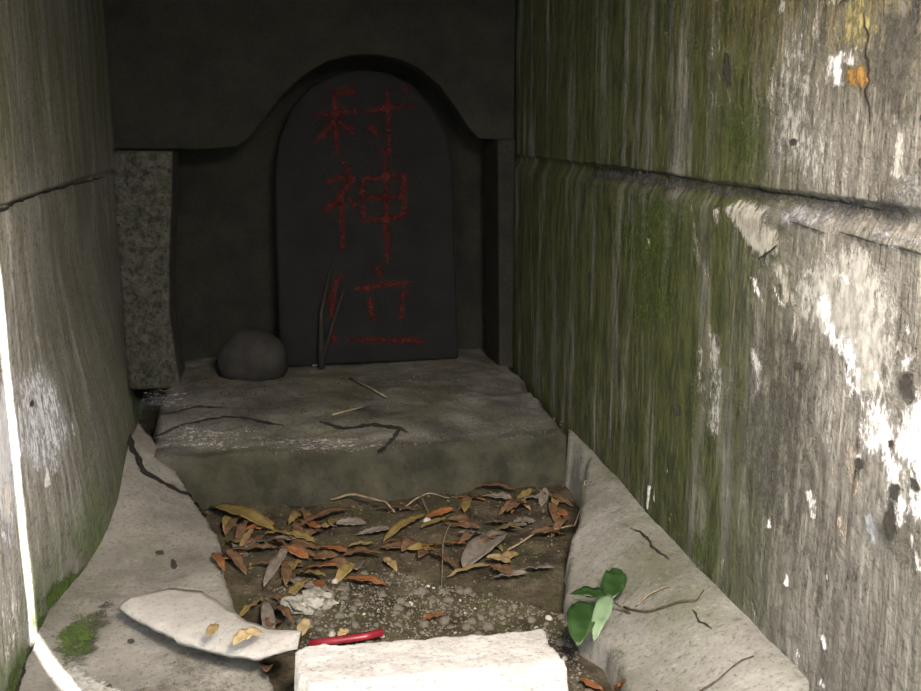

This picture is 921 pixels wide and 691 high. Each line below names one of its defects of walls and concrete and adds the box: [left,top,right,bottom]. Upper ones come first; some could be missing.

rust [846,66,869,89]
crack [0,177,104,212]
crack [587,162,921,255]
peeling [713,200,799,335]
damp [0,366,74,555]
crack [127,405,285,518]
crack [319,421,407,451]
damp [698,243,921,549]
crack [631,528,669,559]
damp [0,572,25,659]